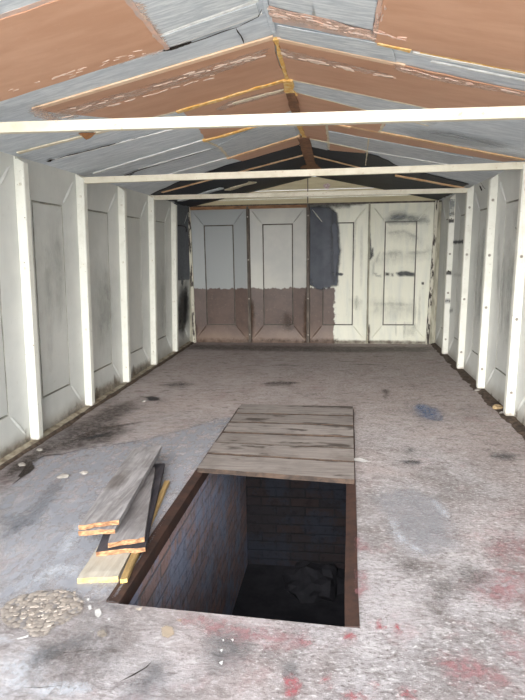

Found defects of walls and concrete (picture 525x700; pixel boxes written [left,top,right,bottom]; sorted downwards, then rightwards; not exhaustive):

peeling [31,49,267,121]